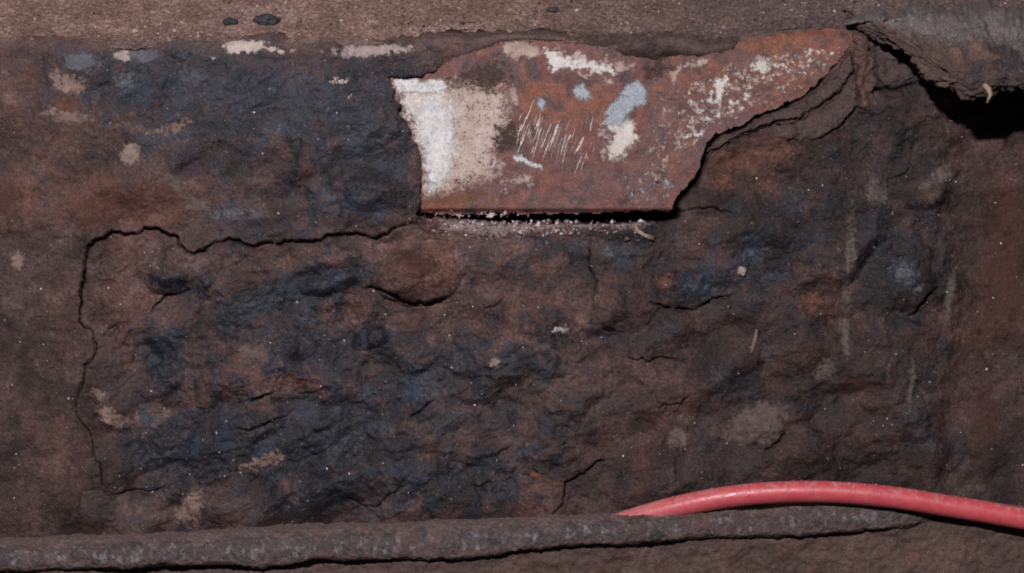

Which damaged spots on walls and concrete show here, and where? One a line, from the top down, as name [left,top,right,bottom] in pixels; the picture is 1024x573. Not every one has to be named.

peeling [389,28,852,216]
rust [698,30,915,194]
crack [48,65,914,525]